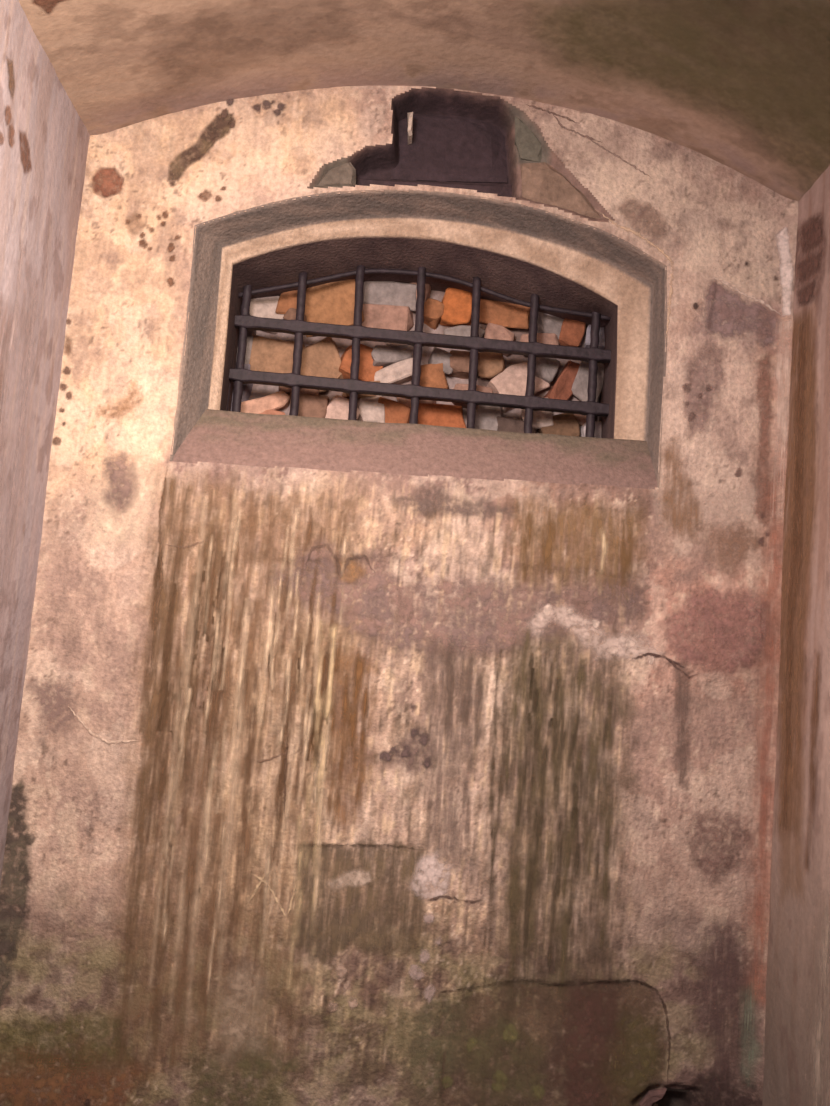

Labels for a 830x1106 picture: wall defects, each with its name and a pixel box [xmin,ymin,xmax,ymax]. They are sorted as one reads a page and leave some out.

spalling [307,87,673,334]
water stain [661,451,756,532]
water stain [96,458,657,1022]
water stain [697,817,749,880]
water stain [223,972,259,1048]